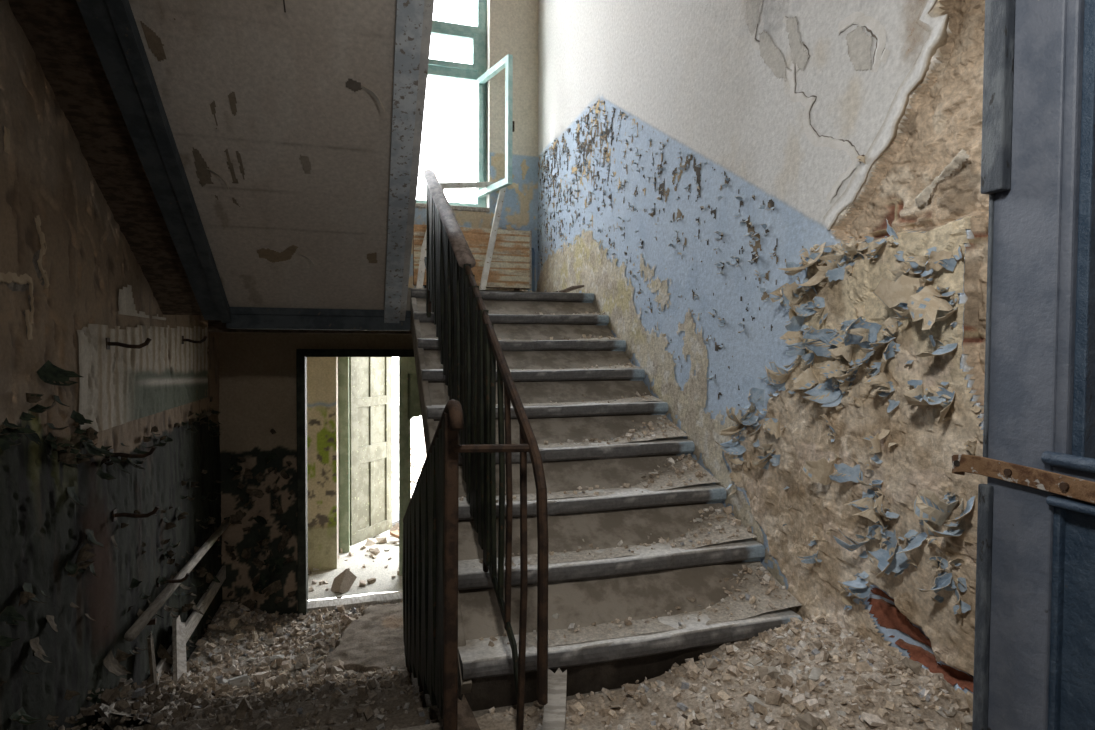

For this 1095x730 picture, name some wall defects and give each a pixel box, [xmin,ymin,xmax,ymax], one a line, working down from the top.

peeling [140,21,166,62]
crack [838,12,890,72]
peeling [346,78,385,111]
crack [751,0,860,203]
peeling [192,147,245,207]
peeling [118,285,166,320]
peeling [491,0,989,710]
peeling [0,360,222,480]
peeling [127,469,223,658]
peeling [0,582,58,674]
peeling [103,631,173,696]